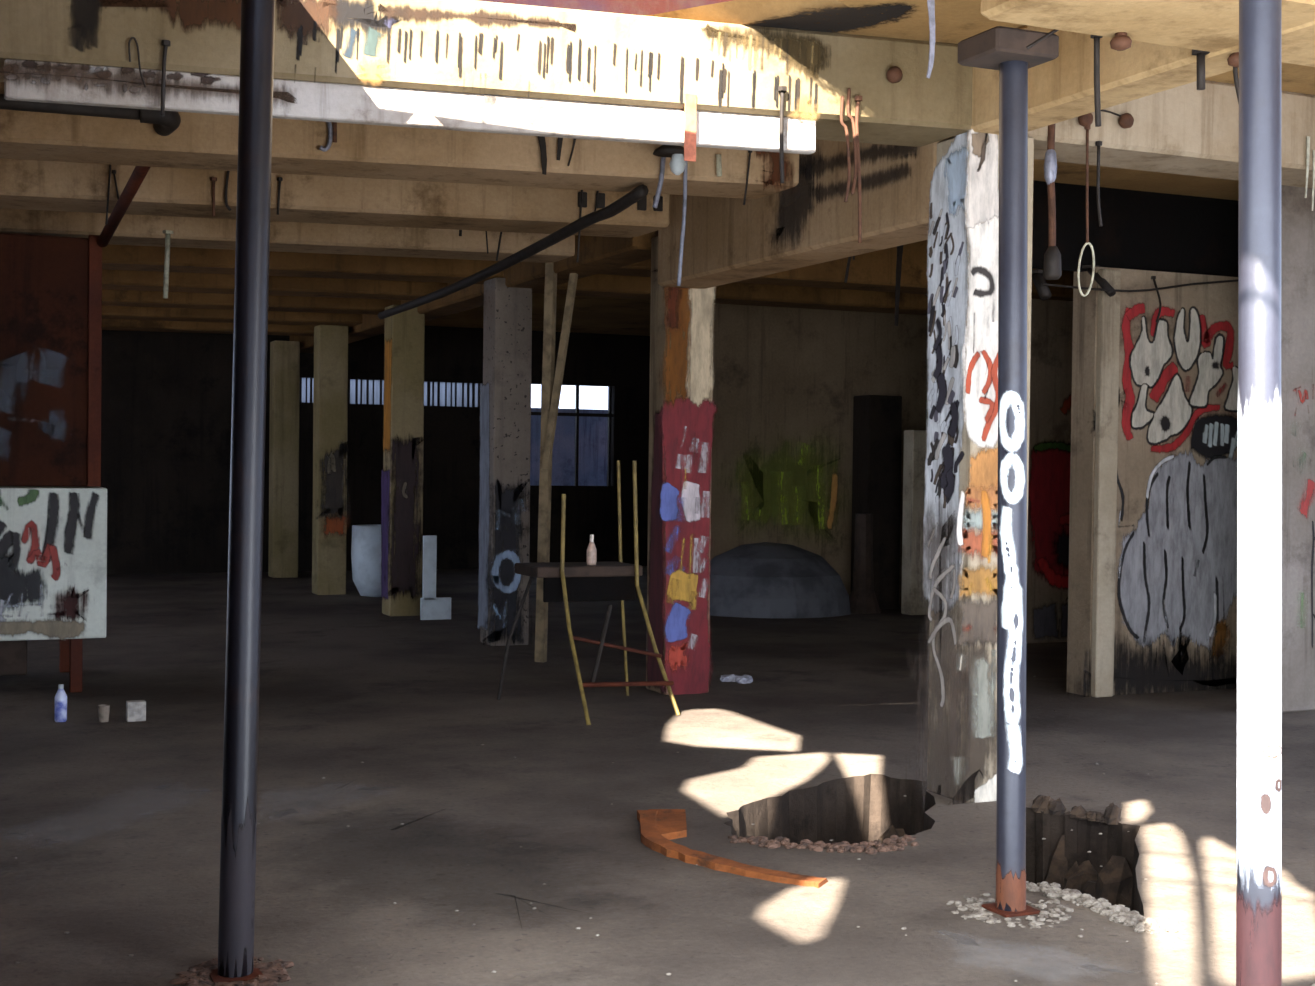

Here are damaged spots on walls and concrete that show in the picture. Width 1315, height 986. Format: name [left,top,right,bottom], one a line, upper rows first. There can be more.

hole [724,774,936,845]
hole [1026,807,1144,916]